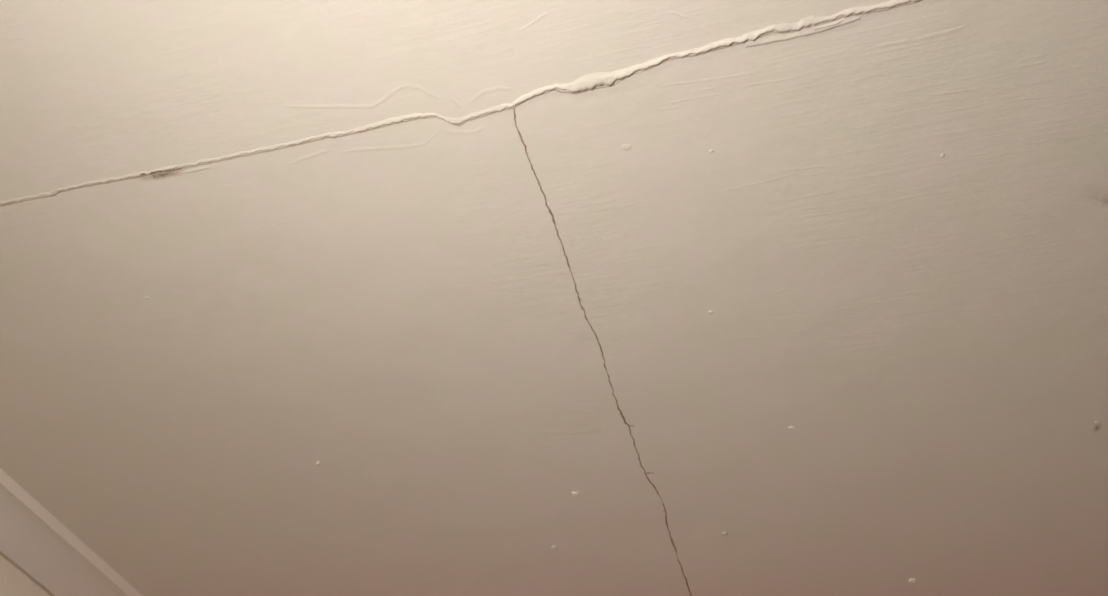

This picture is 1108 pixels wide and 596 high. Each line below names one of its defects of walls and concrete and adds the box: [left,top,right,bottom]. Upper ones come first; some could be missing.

crack [0,0,923,206]
crack [513,108,694,596]
crack [0,552,55,596]